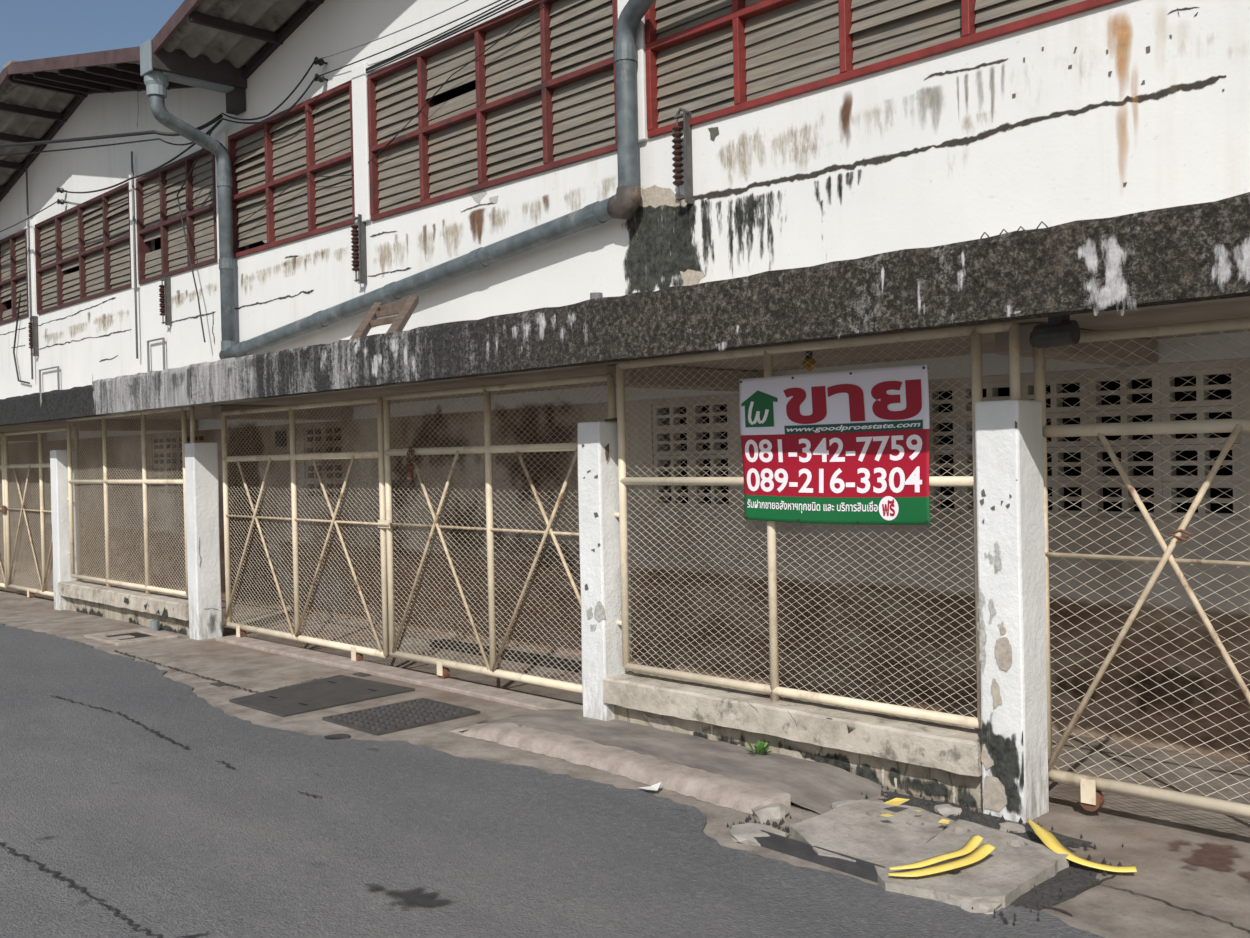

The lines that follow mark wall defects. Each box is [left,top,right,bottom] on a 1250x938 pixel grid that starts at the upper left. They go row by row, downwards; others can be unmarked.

corrosion [1116,20,1130,77]
corrosion [841,97,852,133]
crack [693,75,1226,200]
damp [622,191,786,295]
efflorescence [512,313,575,338]
damp [279,339,415,387]
peeling [984,542,1001,573]
peeling [977,588,1012,709]
crack [57,696,236,769]
mould [978,721,1024,814]
crack [0,836,209,938]